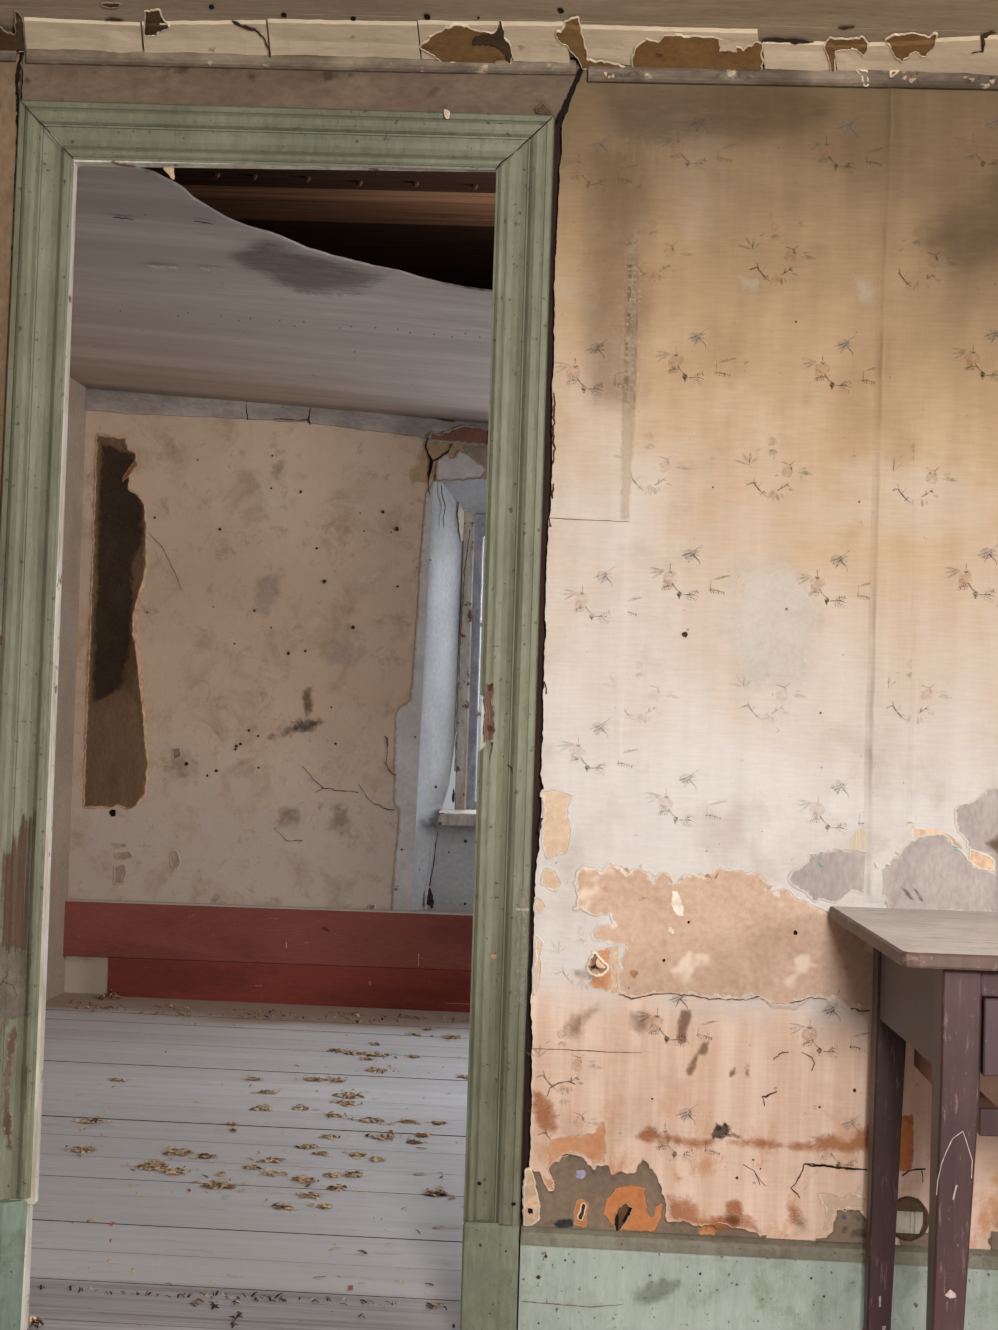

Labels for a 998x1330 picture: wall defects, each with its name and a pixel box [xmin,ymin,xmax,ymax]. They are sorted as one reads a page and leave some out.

flaking render [410,425,488,485]
flaking render [585,951,609,977]
flaking render [522,1153,768,1238]
flaking render [813,1208,866,1243]
flaking render [898,1231,928,1247]
flaking render [987,1230,998,1250]